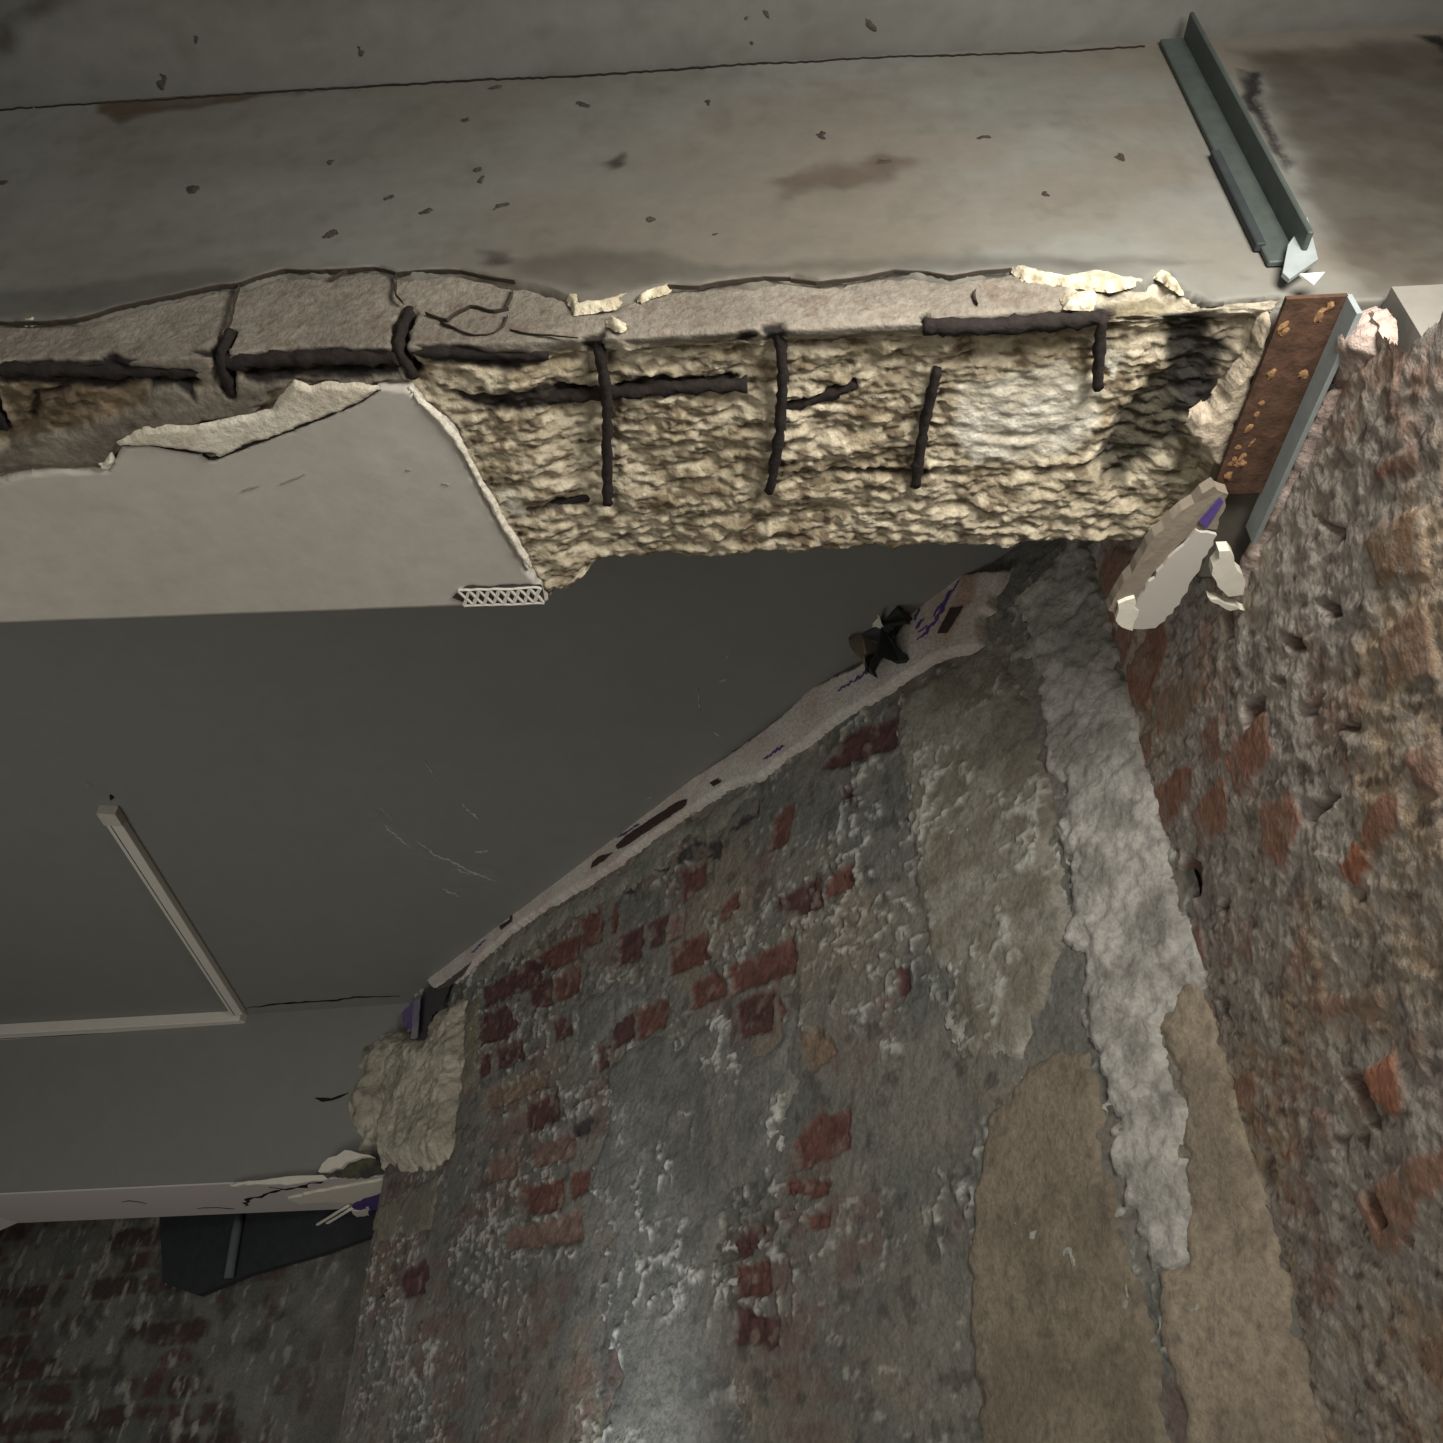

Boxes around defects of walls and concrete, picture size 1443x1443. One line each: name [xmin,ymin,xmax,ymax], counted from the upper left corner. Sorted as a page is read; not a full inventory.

crack [0,45,1145,111]
crack [0,267,579,339]
rust [1277,321,1290,336]
rust [1314,301,1335,324]
spalling [0,265,1277,631]
rust [1224,400,1265,481]
crack [248,996,400,1008]
spalling [231,998,468,1217]
peeling [968,1051,1172,1443]